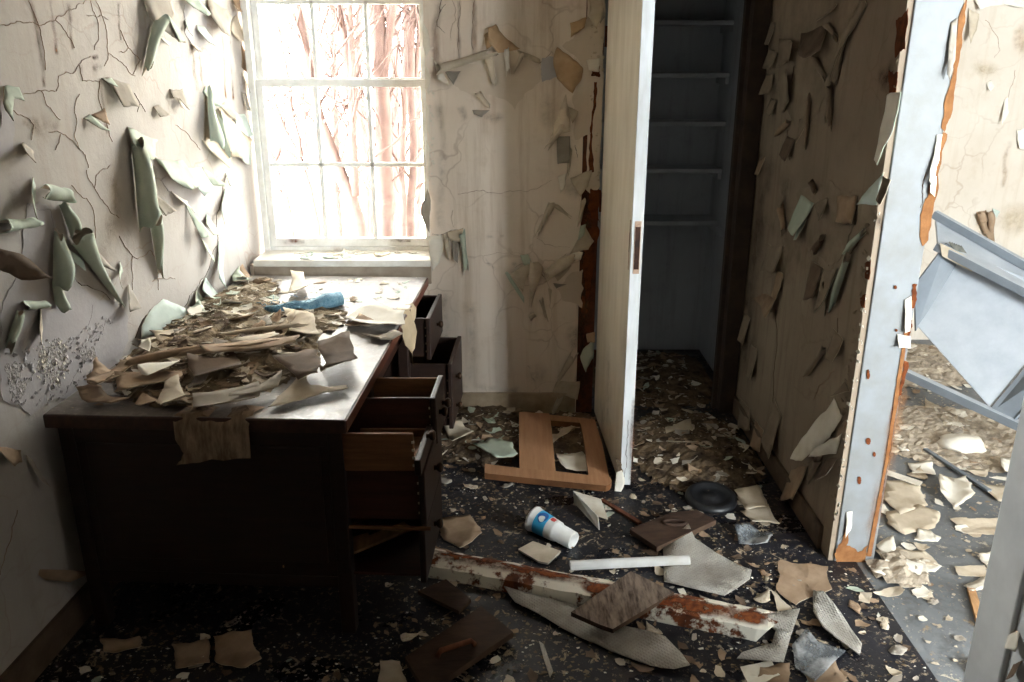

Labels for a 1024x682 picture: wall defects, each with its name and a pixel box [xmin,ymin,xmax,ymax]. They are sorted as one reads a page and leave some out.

peeling [758,0,867,162]
peeling [947,0,1024,80]
crack [2,0,174,290]
peeling [0,0,314,416]
peeling [421,0,605,321]
peeling [753,92,901,399]
peeling [920,134,942,208]
peeling [976,208,1000,242]
peeling [552,332,595,414]
peeling [738,350,781,459]
peeling [780,382,850,501]
peeling [897,296,911,348]